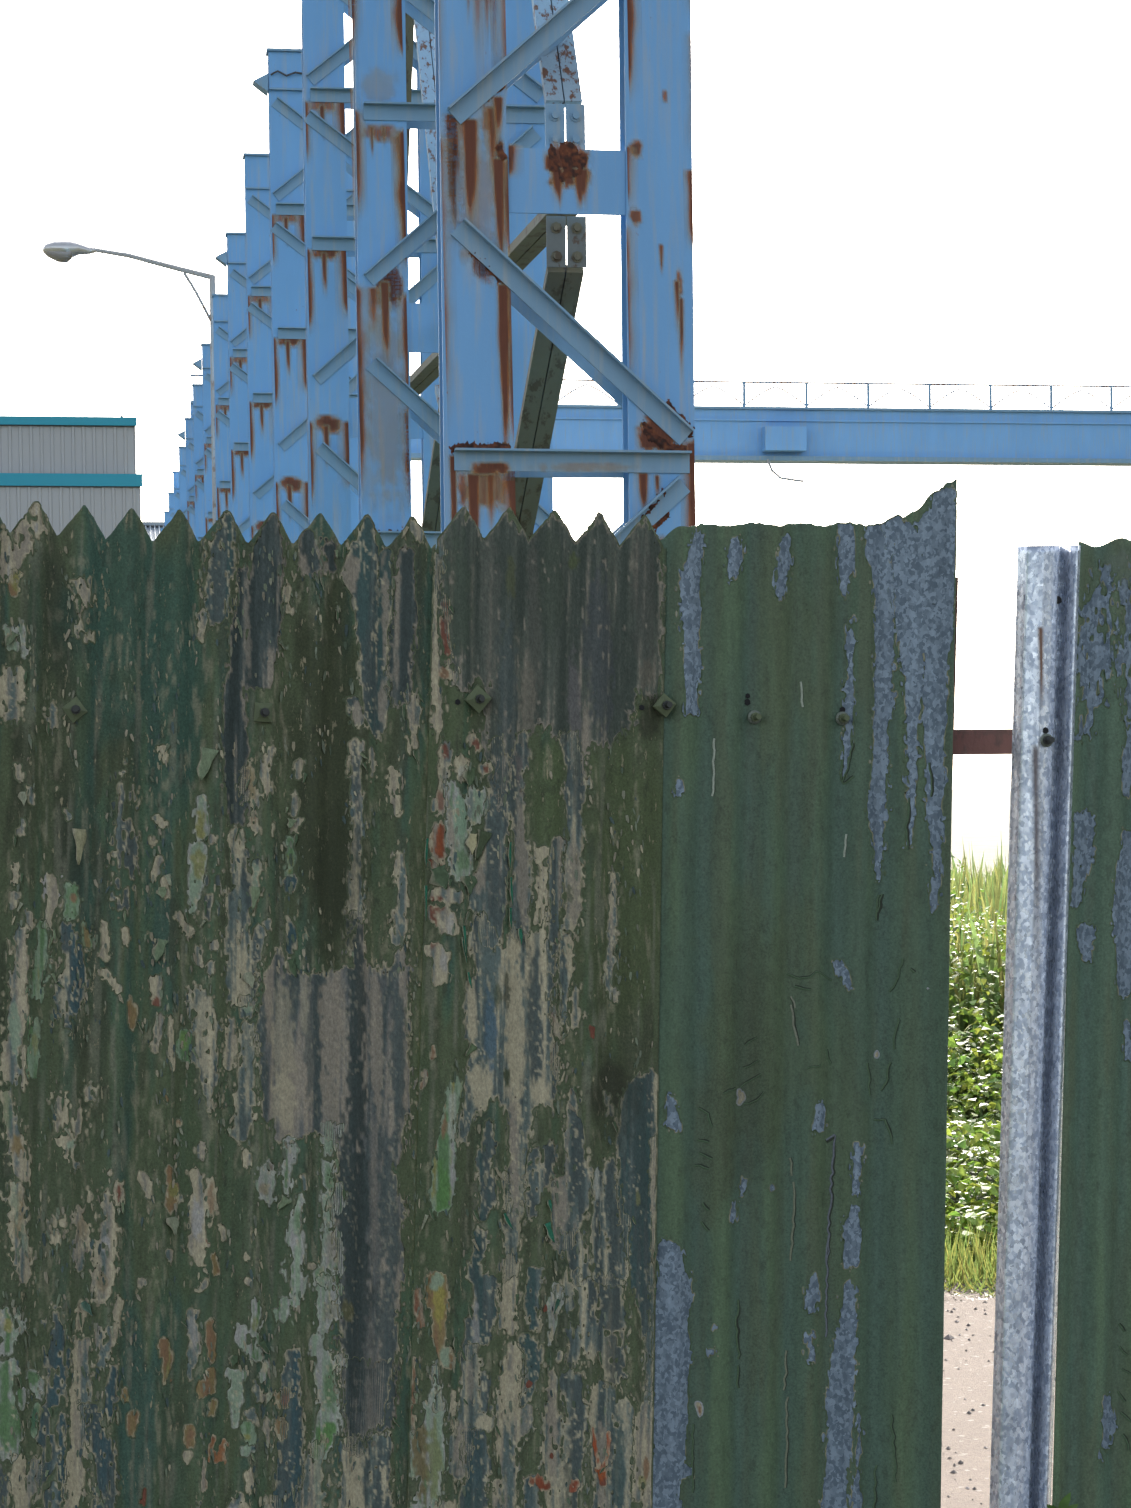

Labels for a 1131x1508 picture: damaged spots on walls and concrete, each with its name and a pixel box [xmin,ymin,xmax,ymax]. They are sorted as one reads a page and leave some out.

rust [187,215,409,538]
rust [305,0,406,238]
rust [441,96,516,380]
rust [450,455,516,528]
rust [473,257,514,444]
rust [637,416,696,527]
peeling [673,527,747,719]
peeling [833,484,957,915]
peeling [1074,549,1131,800]
peeling [0,501,719,1508]
peeling [1069,806,1131,1063]
peeling [801,1141,867,1508]